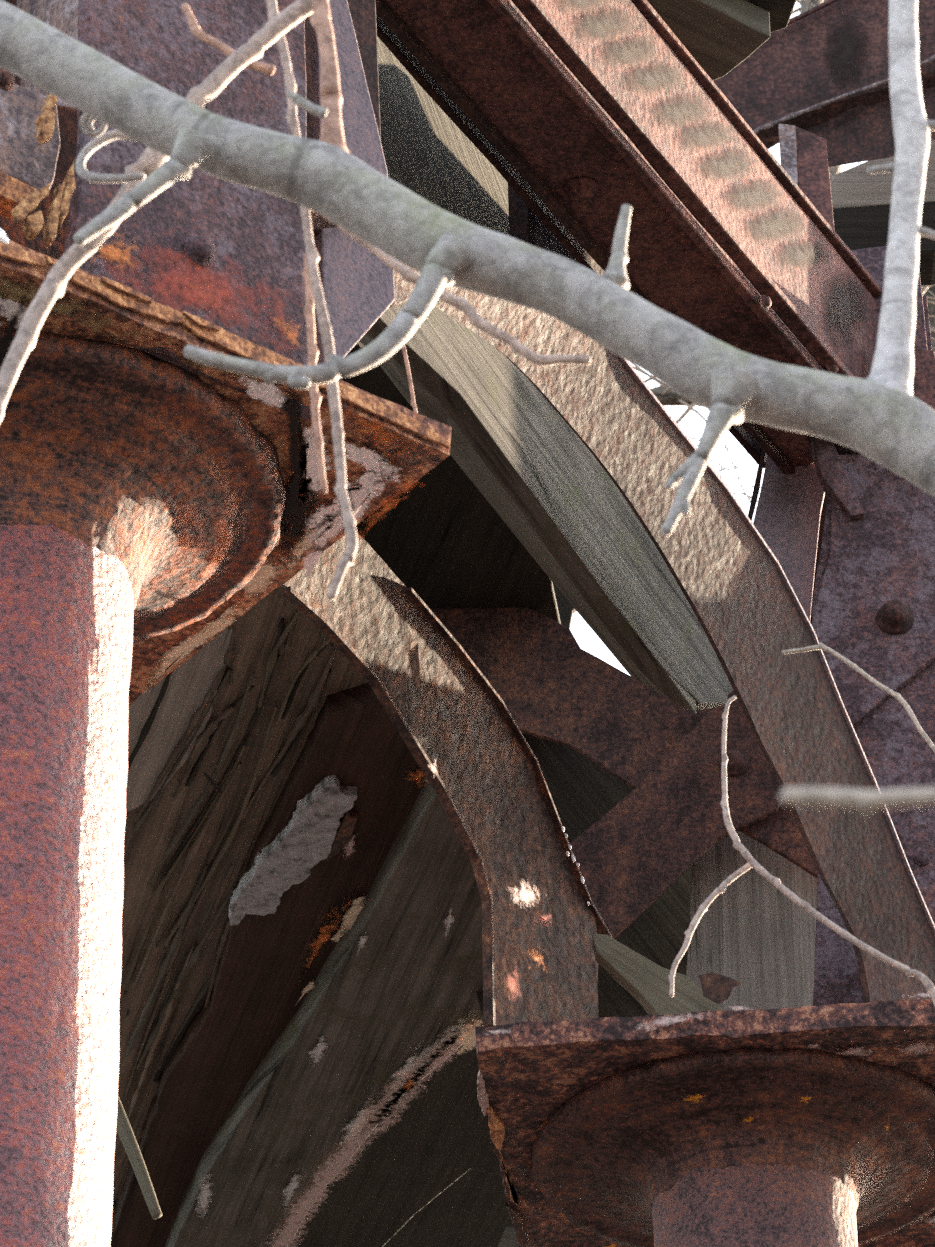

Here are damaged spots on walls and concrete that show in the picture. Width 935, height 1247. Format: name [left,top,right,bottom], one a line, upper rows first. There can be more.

rust [100,245,147,264]
rust [154,251,251,317]
rust [359,485,415,540]
rust [410,760,437,783]
spalling [229,775,358,925]
rust [513,882,539,906]
rust [310,925,336,959]
peeling [331,897,365,942]